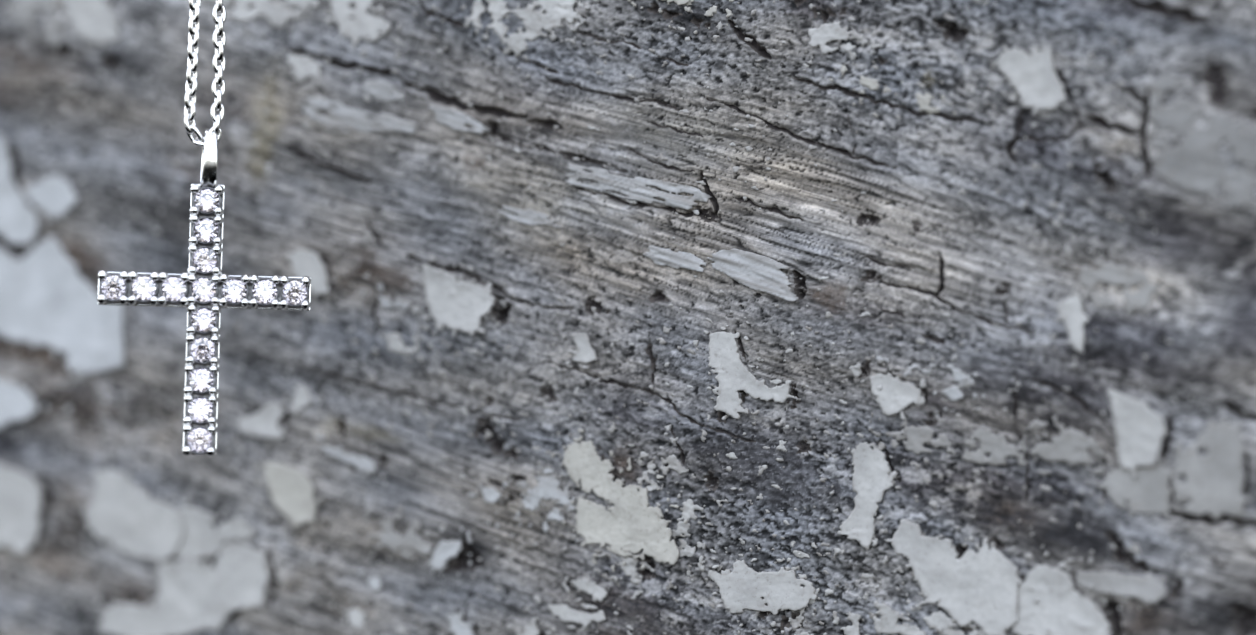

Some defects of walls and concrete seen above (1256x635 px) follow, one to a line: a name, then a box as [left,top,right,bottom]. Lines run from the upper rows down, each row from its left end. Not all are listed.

peeling [201,0,401,99]
crack [418,0,474,28]
peeling [464,0,599,71]
crack [286,48,803,222]
crack [498,19,980,169]
peeling [990,46,1079,127]
crack [1006,70,1152,178]
peeling [361,249,496,362]
peeling [233,384,389,533]
crack [547,340,760,465]
peeling [467,325,1252,635]
peeling [81,458,280,635]